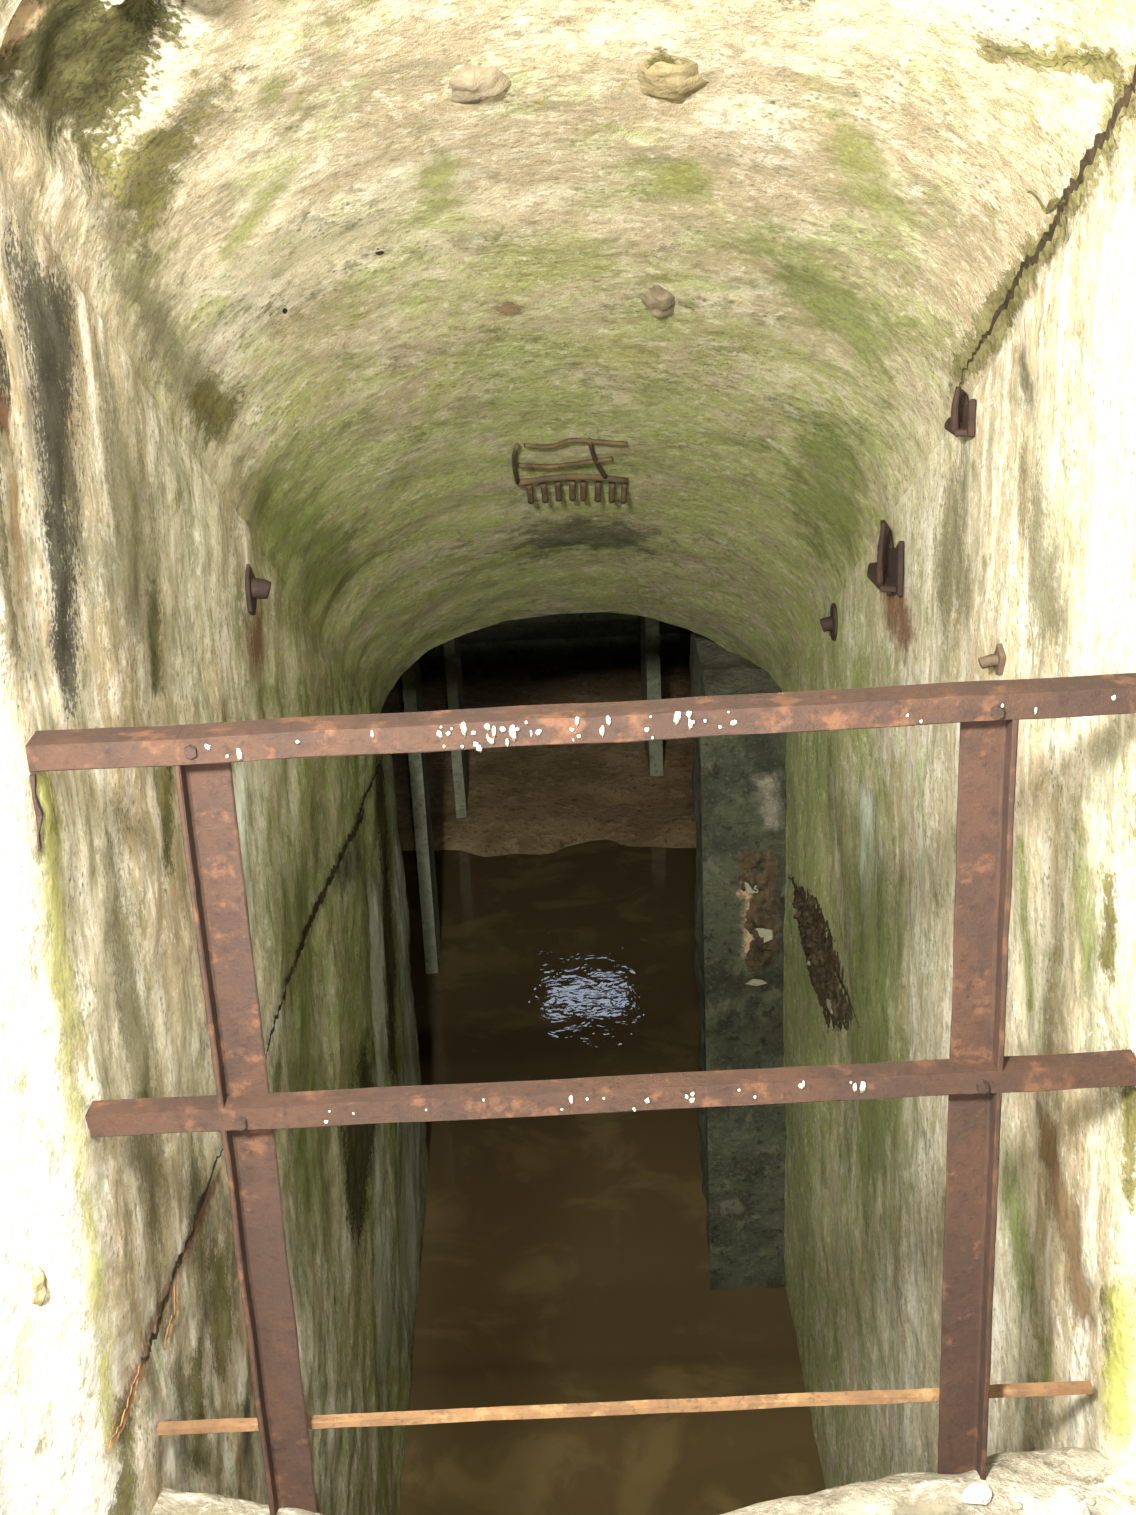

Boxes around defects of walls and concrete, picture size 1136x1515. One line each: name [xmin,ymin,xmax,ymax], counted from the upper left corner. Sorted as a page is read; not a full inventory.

spalling [100,0,125,12]
crack [959,44,1136,387]
damp [0,208,165,722]
rust [884,592,912,651]